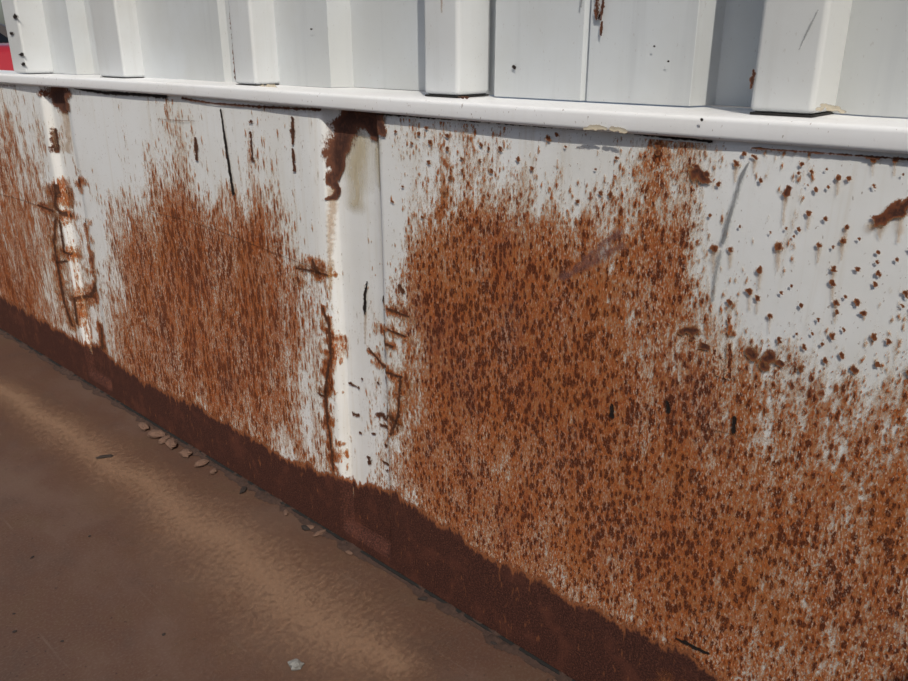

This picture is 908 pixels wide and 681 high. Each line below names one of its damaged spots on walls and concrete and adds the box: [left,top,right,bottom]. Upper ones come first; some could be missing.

corrosion [33,86,71,117]
corrosion [186,112,203,161]
corrosion [277,116,303,172]
corrosion [321,110,387,204]
corrosion [398,119,435,160]
corrosion [778,153,851,197]
corrosion [872,197,908,228]
corrosion [60,221,91,294]
corrosion [769,224,801,272]
corrosion [729,269,760,301]
corrosion [833,295,867,319]
corrosion [864,331,906,361]